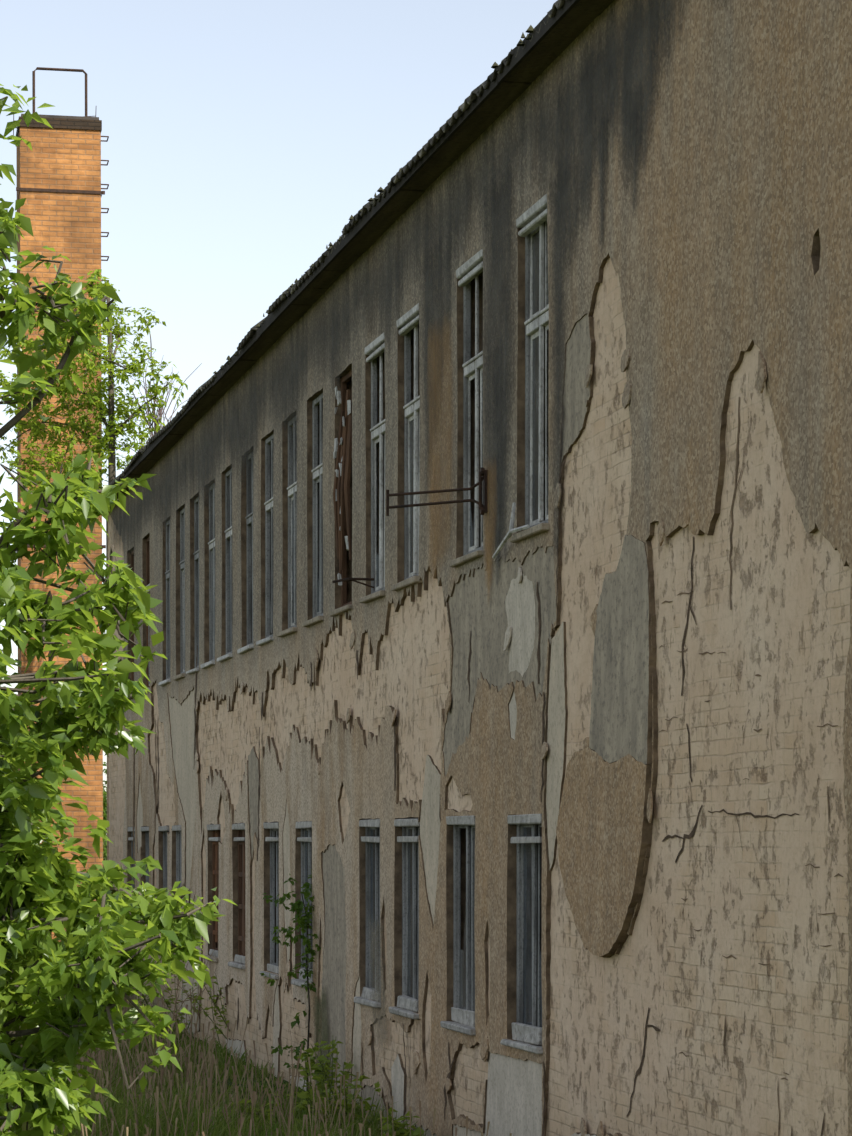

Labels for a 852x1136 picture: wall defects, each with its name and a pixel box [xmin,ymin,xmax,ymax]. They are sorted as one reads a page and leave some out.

leakage [113,0,679,571]
flaking render [108,513,124,589]
flaking render [130,258,851,1136]
flaking render [108,751,157,899]
crack [662,724,799,863]